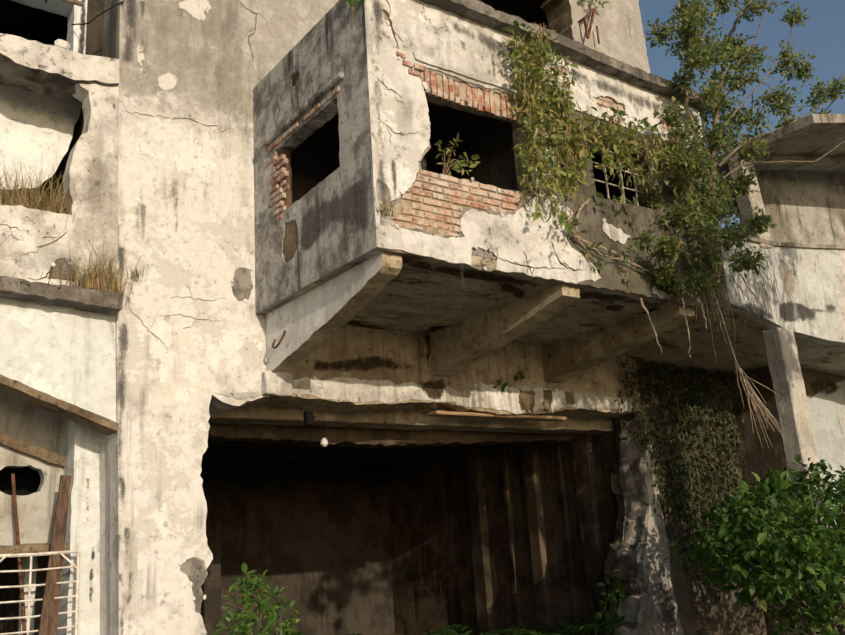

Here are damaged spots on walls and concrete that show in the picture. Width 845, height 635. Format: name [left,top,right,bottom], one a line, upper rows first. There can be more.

peeling [176,0,211,21]
crack [239,1,260,68]
flaking render [396,49,529,125]
flaking render [266,86,340,265]
damp [299,176,368,270]
flaking render [391,169,531,236]
flaking render [231,268,255,303]
damp [736,301,816,321]
damp [315,356,411,372]
peeling [292,375,631,414]
peeling [800,367,845,398]
flaking render [178,557,208,614]